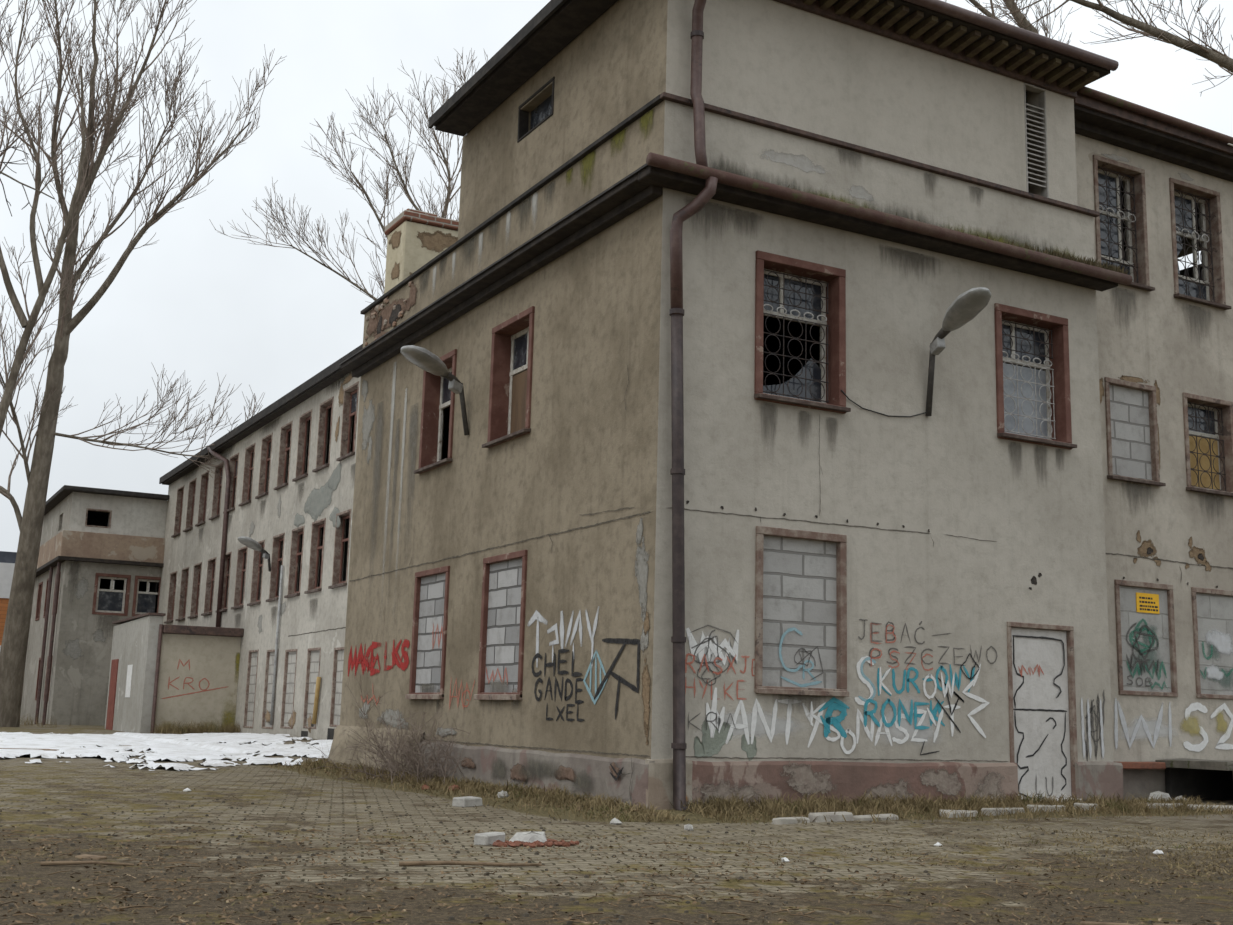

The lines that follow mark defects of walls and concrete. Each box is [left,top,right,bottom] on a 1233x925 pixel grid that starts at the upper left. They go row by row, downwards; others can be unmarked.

flaking render [417,230,458,252]
flaking render [364,230,417,346]
flaking render [1133,530,1161,566]
flaking render [1185,537,1212,571]
flaking render [780,761,836,799]
flaking render [864,768,1005,803]